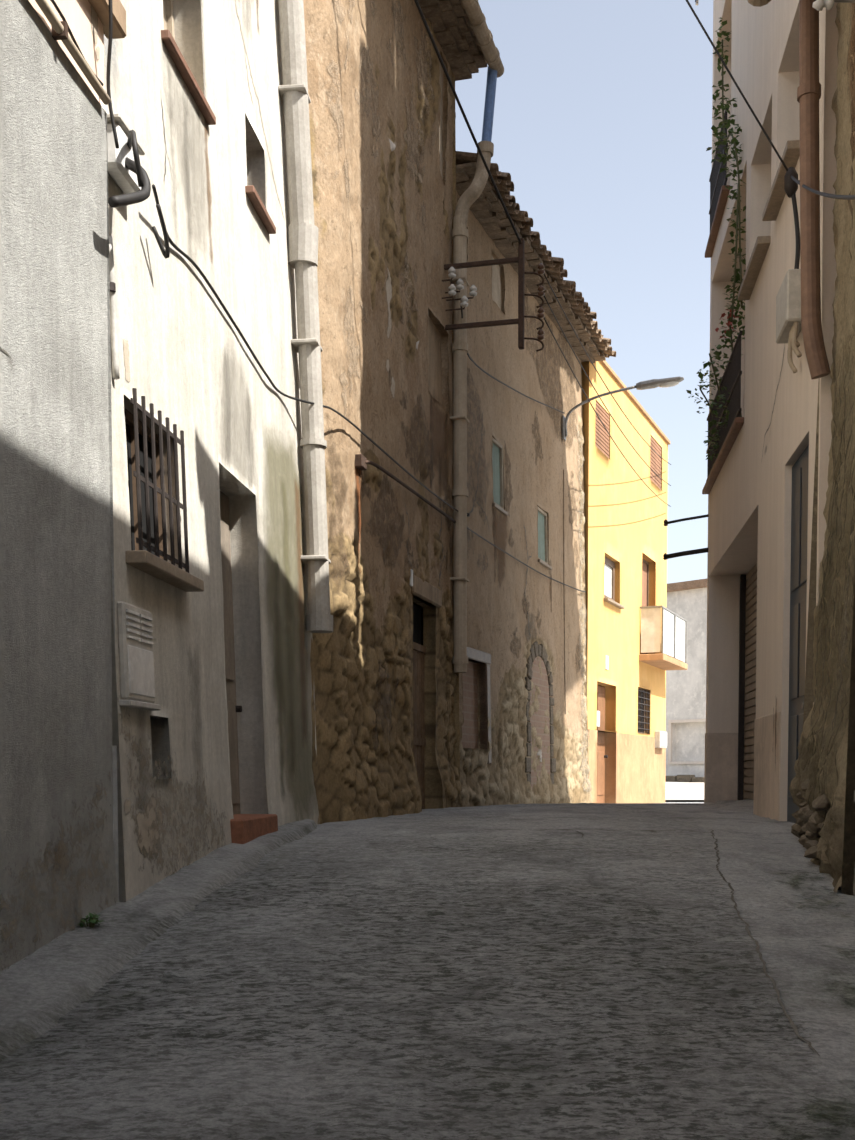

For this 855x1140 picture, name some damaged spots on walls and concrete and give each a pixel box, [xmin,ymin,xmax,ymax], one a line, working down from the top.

flaking render [325,447,418,580]
flaking render [524,285,592,792]
crack [544,829,820,1056]